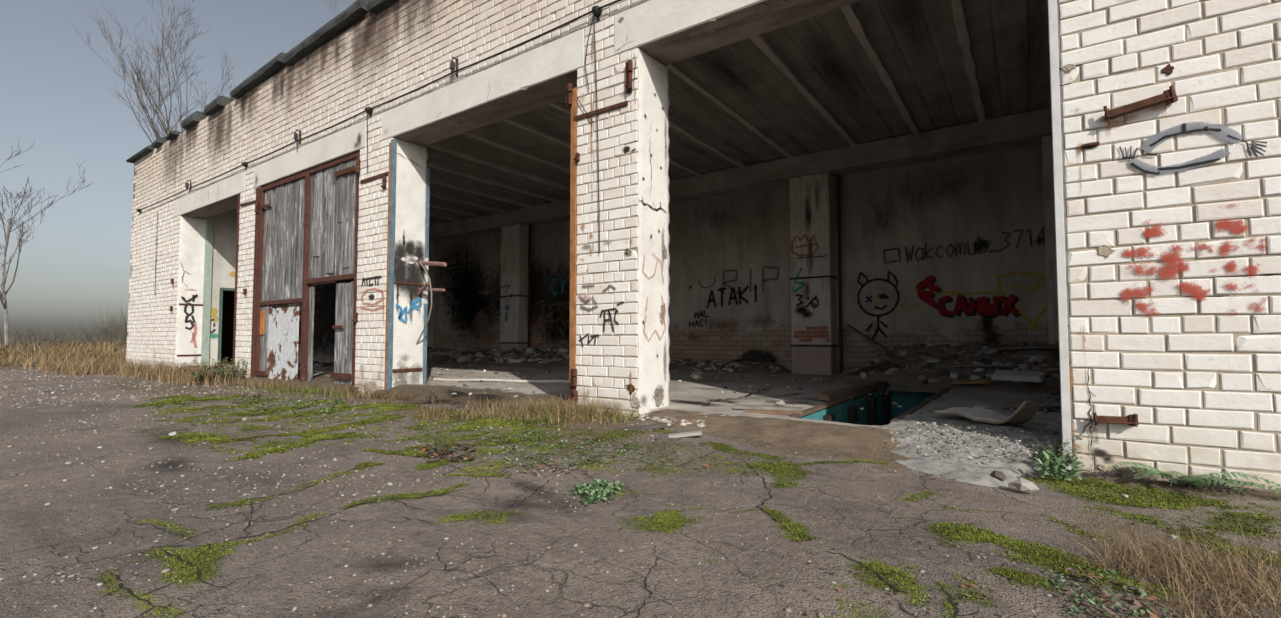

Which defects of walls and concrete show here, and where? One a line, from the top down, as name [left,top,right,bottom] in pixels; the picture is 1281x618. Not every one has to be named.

water stain [358,8,410,52]
water stain [396,281,422,318]
water stain [438,244,492,329]
crack [101,450,554,618]
crack [625,539,677,618]